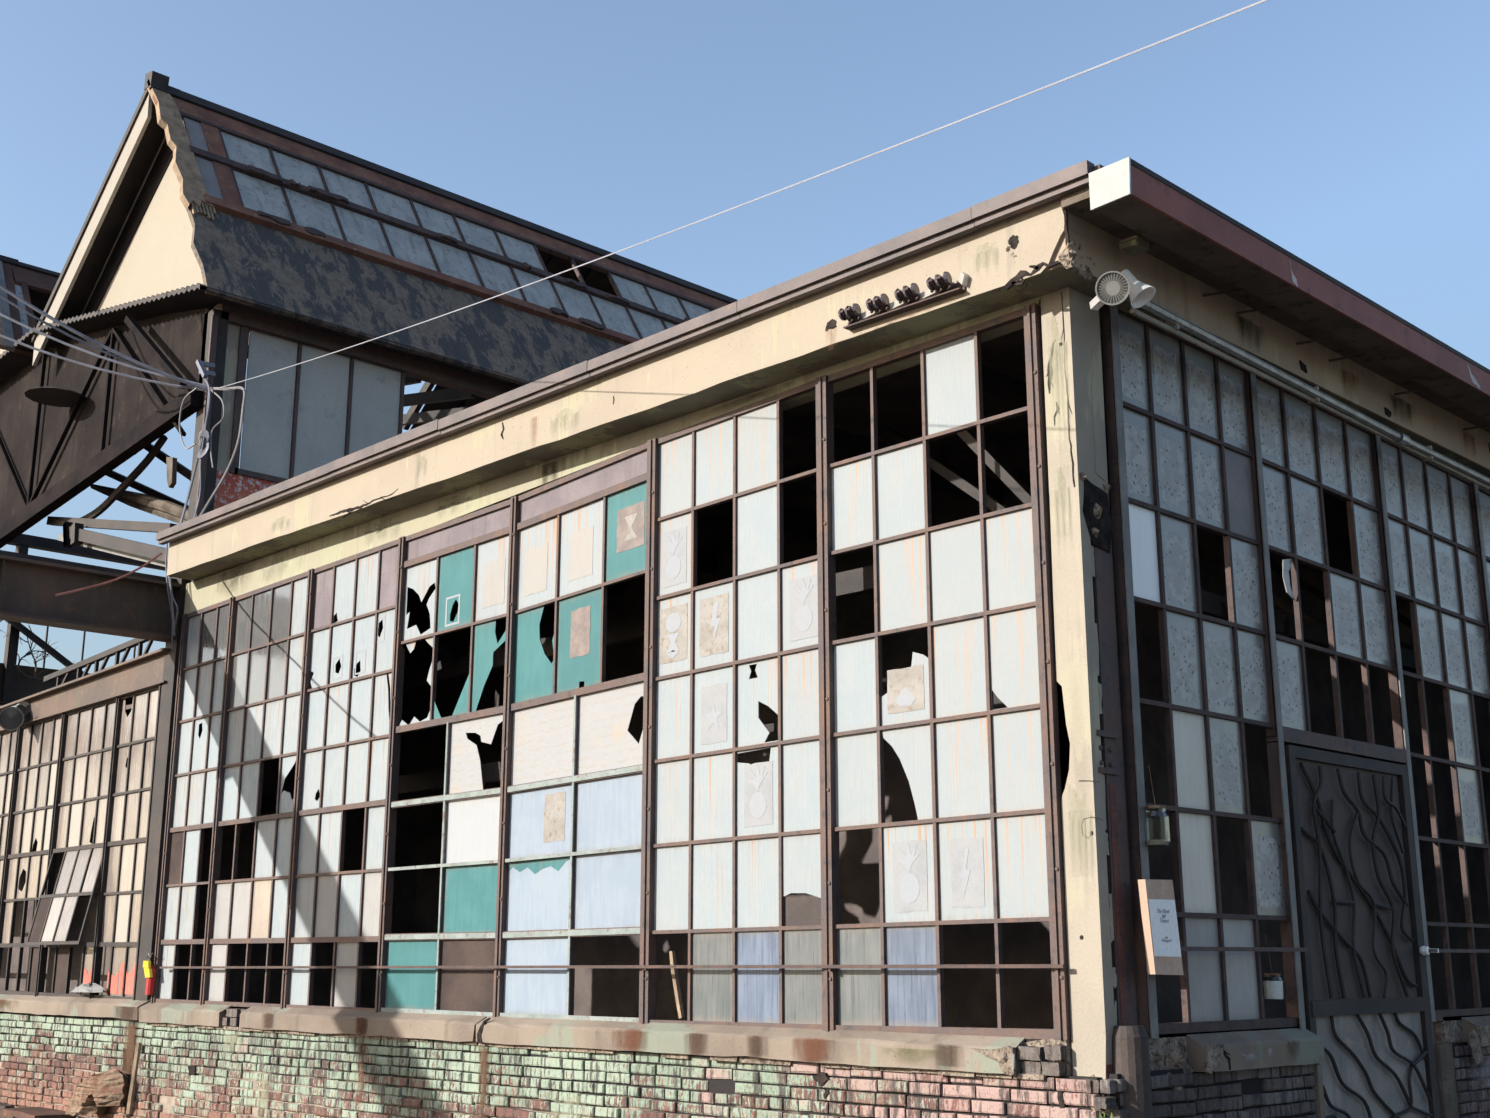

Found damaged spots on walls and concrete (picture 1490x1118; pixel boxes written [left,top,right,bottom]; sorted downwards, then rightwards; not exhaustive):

crack [1005,209,1075,487]
spalling [123,1048,131,1073]
spalling [812,1072,830,1099]